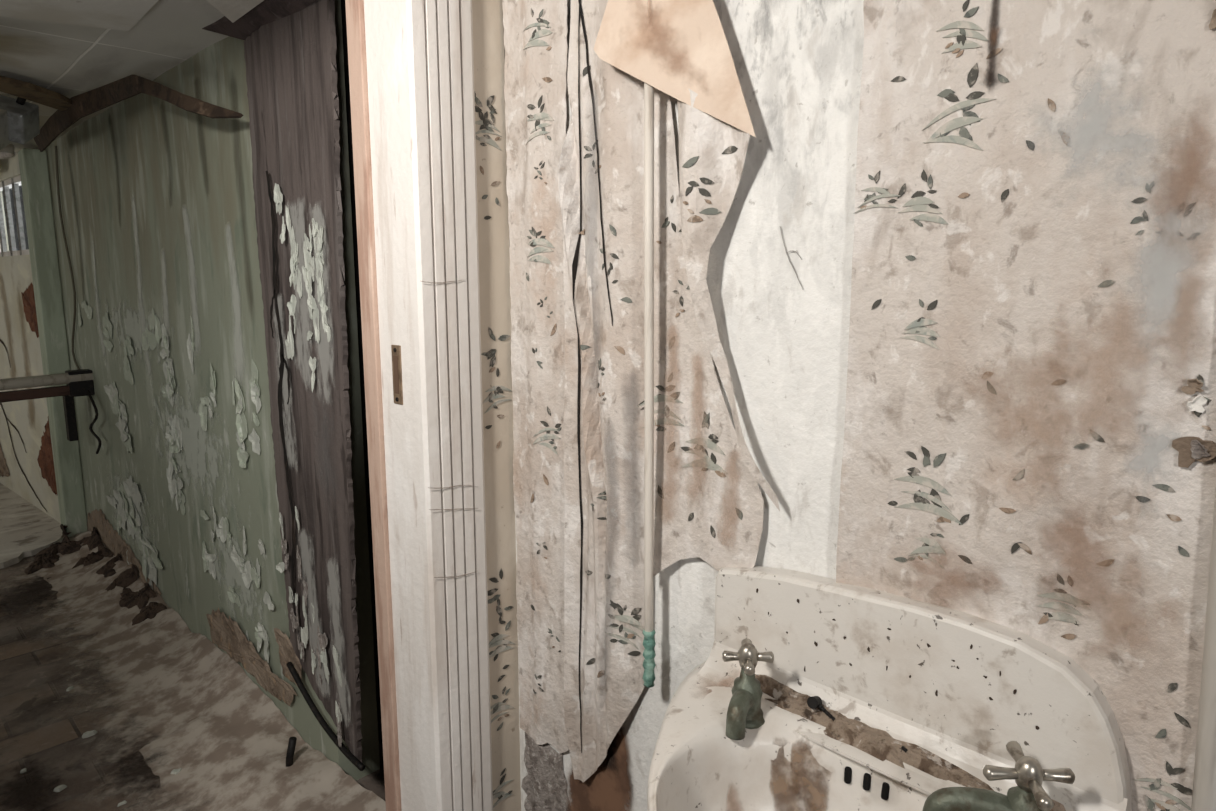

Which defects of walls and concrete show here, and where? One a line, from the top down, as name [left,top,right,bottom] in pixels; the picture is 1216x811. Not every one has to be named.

flaking render [21,283,39,338]
peeling [274,183,331,392]
flaking render [78,301,342,706]
flaking render [521,732,569,811]